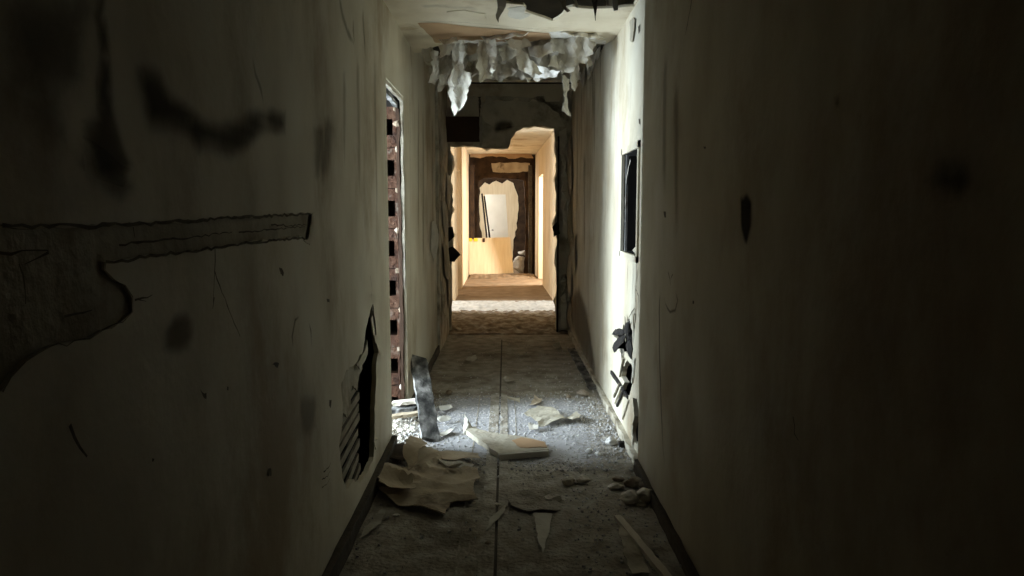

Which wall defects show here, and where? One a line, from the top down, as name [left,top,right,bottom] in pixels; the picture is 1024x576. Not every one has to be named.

damp [92,63,128,173]
damp [144,76,284,151]
peeling [581,44,604,87]
spalling [440,96,575,330]
spalling [0,212,315,392]
spalling [329,293,384,483]
spalling [610,313,638,447]